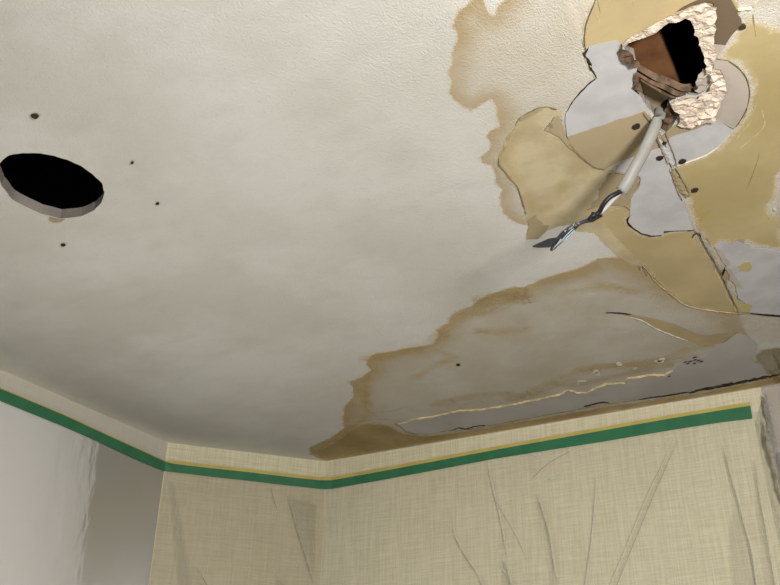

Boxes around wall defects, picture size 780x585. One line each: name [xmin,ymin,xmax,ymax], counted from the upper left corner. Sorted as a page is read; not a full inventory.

leakage [449,0,635,225]
peeling [544,0,753,236]
leakage [668,0,780,182]
leakage [309,257,780,460]
leakage [681,194,745,297]
peeling [715,241,780,315]